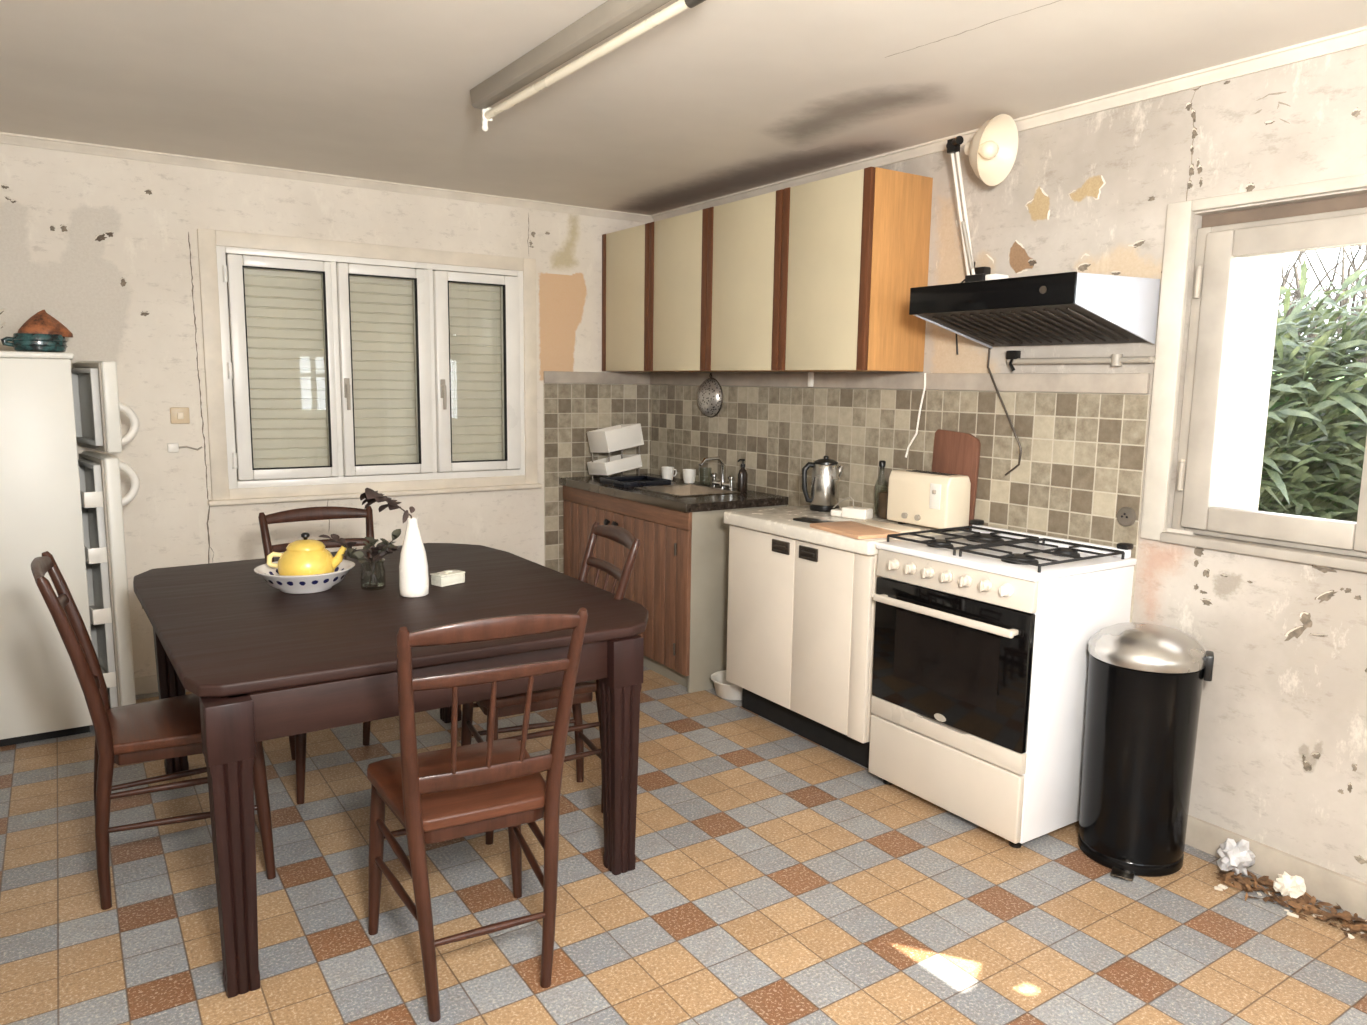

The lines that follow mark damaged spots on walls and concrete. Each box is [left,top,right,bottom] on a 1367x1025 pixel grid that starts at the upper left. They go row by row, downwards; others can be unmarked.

peeling [928,187,1039,286]
peeling [1024,172,1107,225]
peeling [0,184,149,371]
peeling [536,268,590,384]
spalling [1194,547,1253,606]
spalling [1284,565,1361,641]
spalling [1295,737,1327,777]